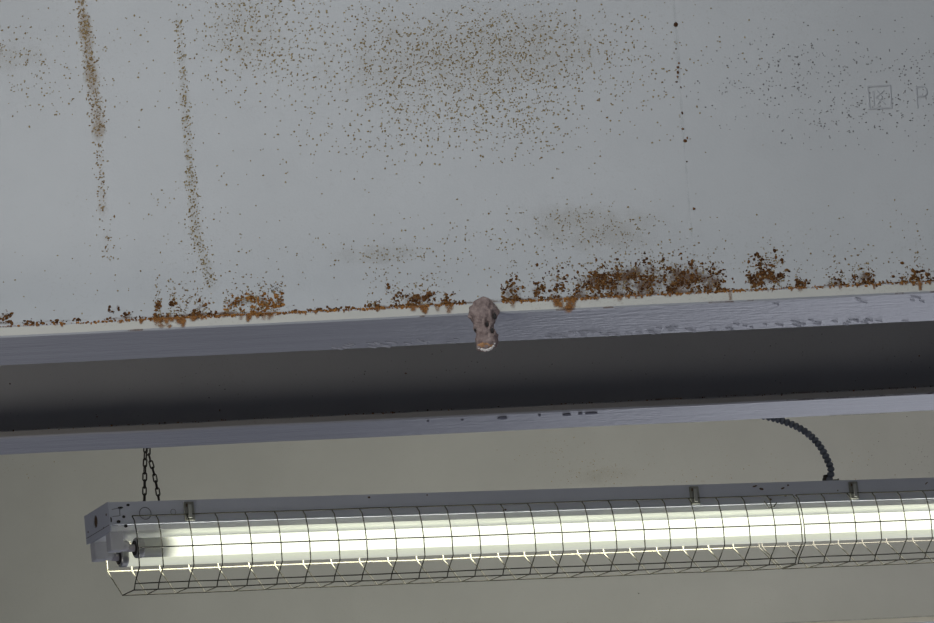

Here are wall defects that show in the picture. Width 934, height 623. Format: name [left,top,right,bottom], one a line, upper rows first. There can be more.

rust [0,0,934,331]